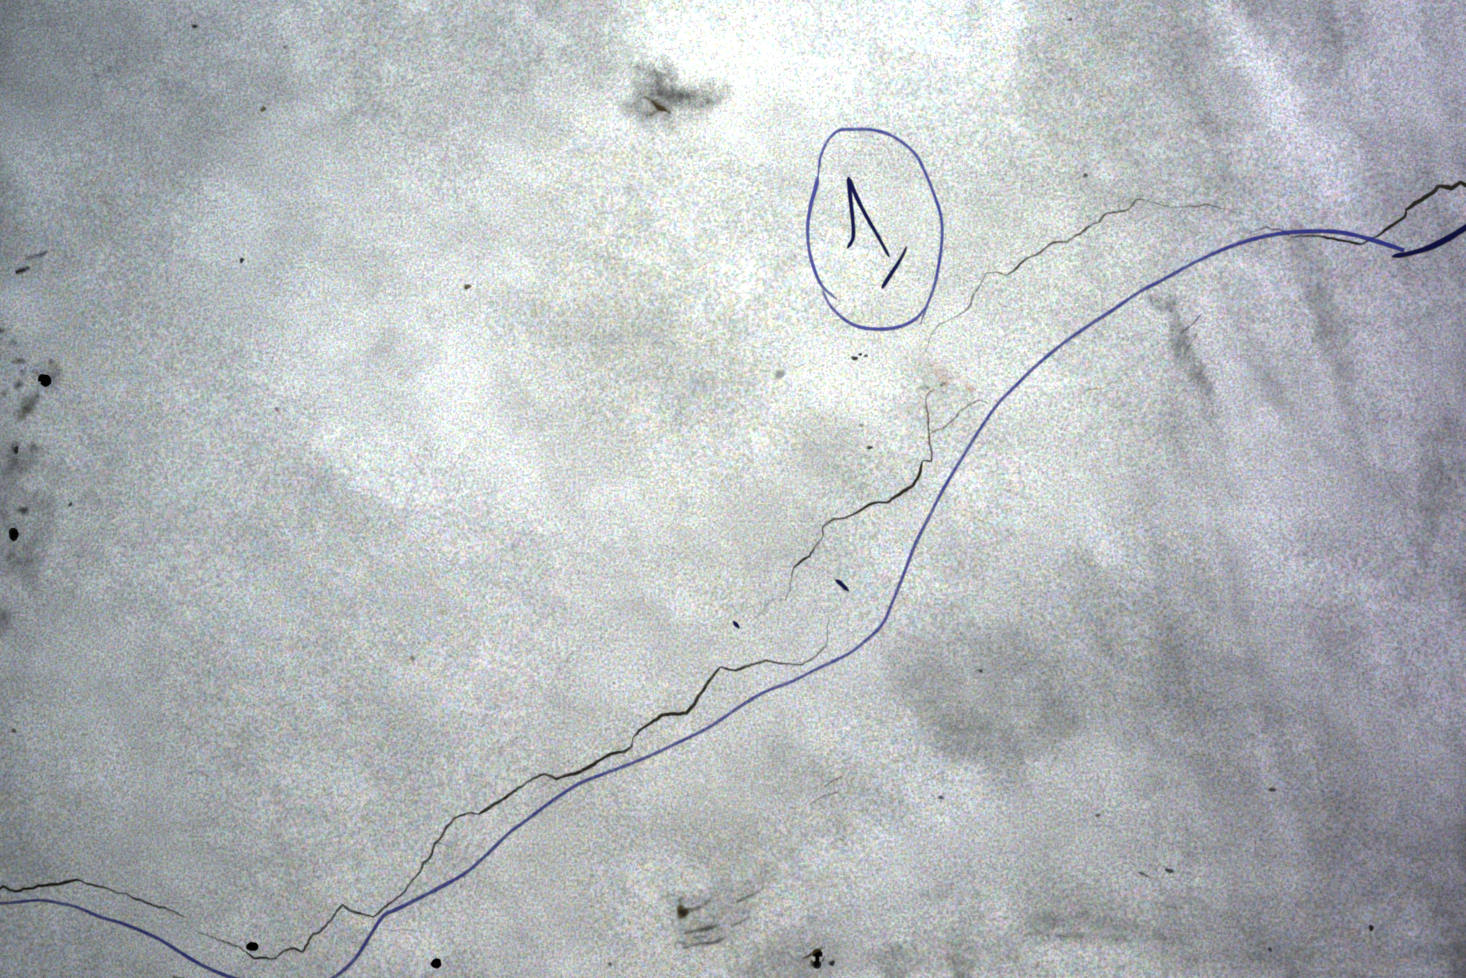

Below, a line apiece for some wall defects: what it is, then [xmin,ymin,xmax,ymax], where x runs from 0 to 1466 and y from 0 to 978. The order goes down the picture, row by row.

damp [645,90,688,114]
crack [969,199,1141,307]
crack [1294,181,1466,245]
crack [792,411,946,573]
crack [229,651,821,959]
crack [0,879,175,912]